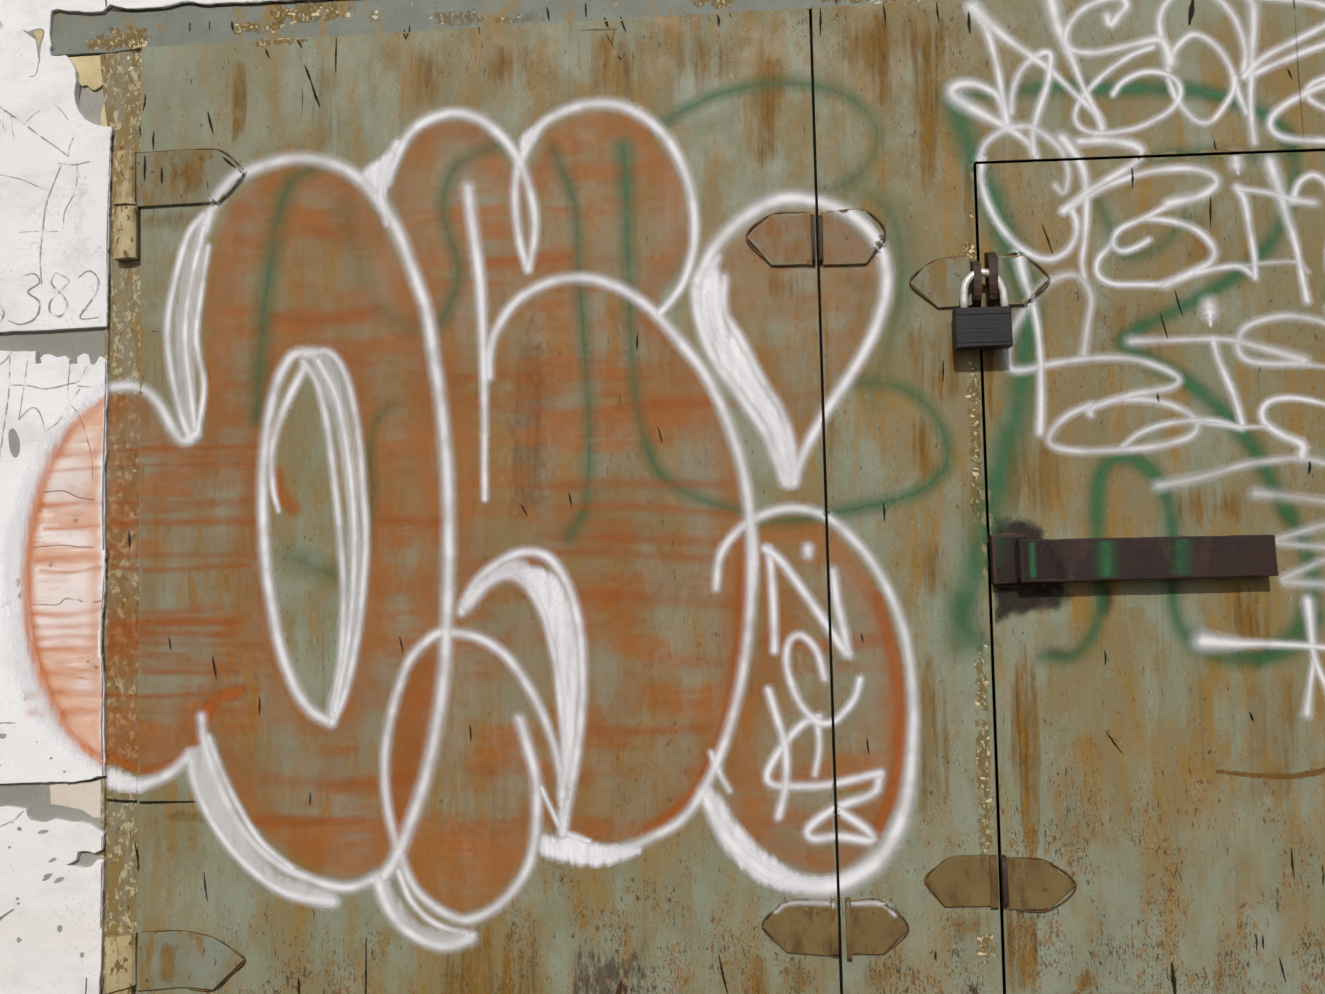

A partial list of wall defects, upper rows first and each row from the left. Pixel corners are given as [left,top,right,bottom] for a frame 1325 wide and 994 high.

spalling [69,27,150,127]
corrosion [920,44,934,178]
spalling [0,770,101,834]
corrosion [1012,668,1037,857]
corrosion [1216,767,1325,779]
spalling [43,851,100,883]